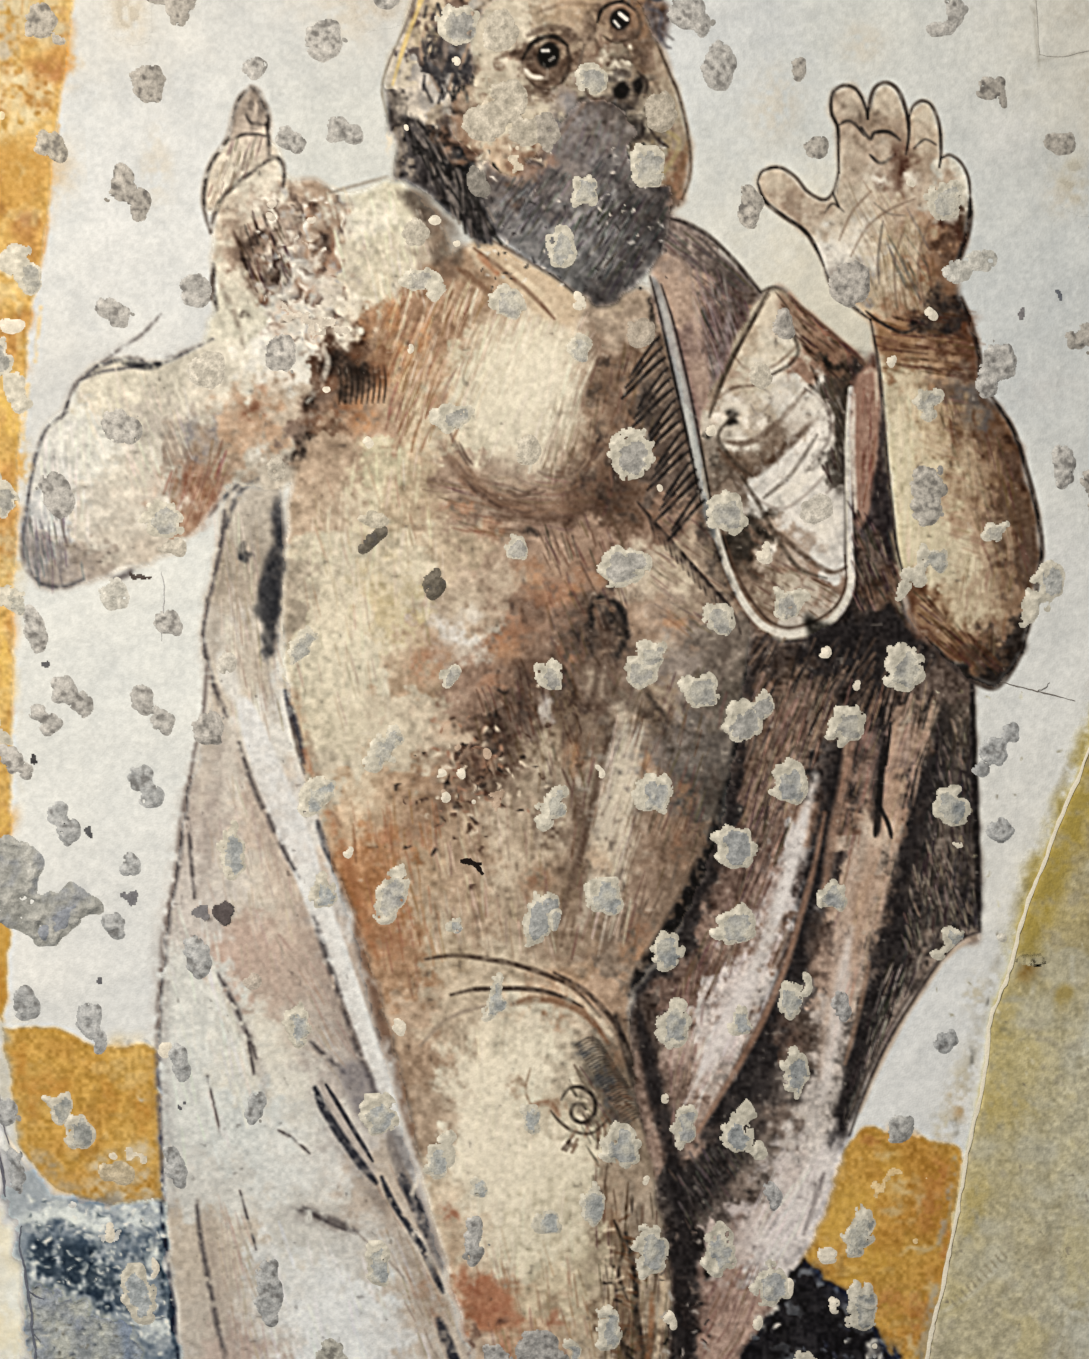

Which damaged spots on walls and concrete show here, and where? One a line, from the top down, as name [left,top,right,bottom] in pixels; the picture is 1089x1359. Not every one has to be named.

peeling [266,199,276,221]
peeling [280,301,350,339]
peeling [871,1168,902,1198]